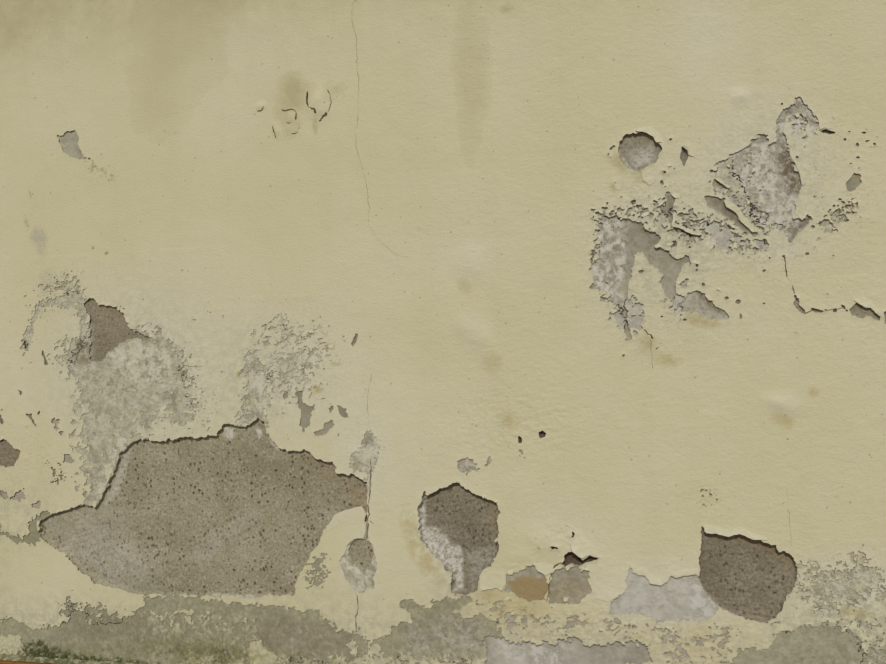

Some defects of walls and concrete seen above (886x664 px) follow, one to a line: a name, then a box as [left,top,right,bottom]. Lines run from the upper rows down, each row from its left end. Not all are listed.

peeling [57,130,93,161]
peeling [587,96,878,341]
flaking render [0,271,886,664]